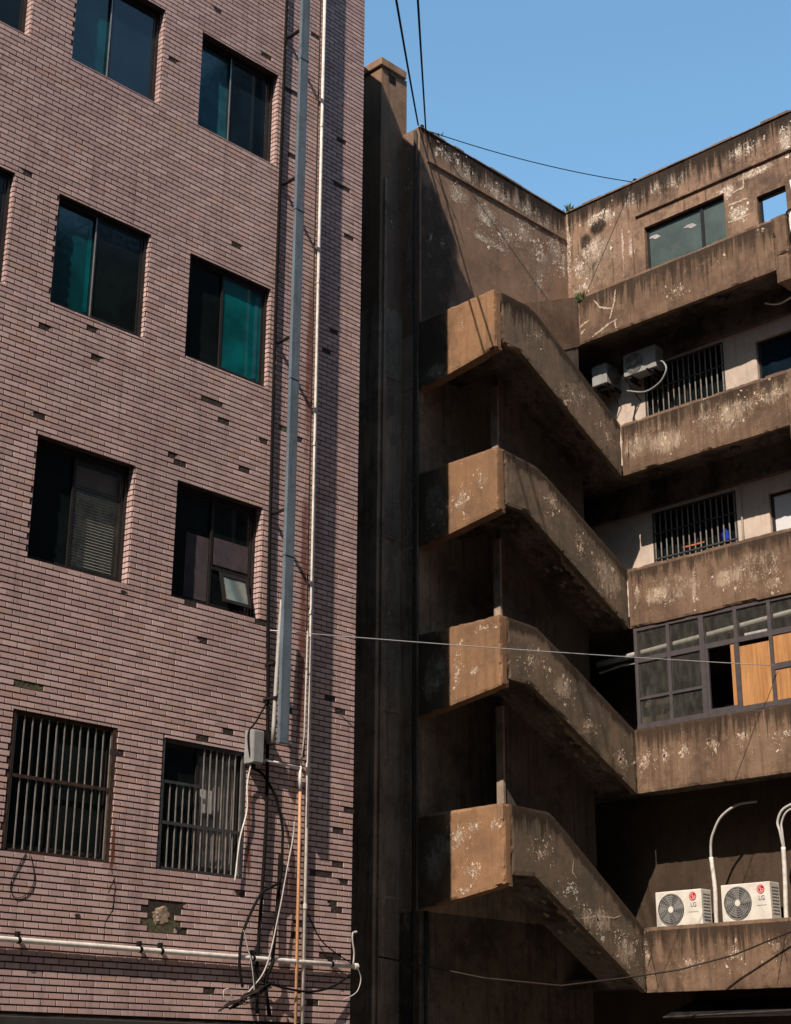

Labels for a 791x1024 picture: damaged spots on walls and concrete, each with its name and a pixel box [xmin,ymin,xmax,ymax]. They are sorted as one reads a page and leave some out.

damp [421,112,791,248]
crack [580,289,617,337]
damp [502,293,785,440]
damp [582,221,772,313]
damp [505,450,791,584]
peeling [13,680,43,692]
spalling [140,899,188,935]
damp [512,805,791,960]